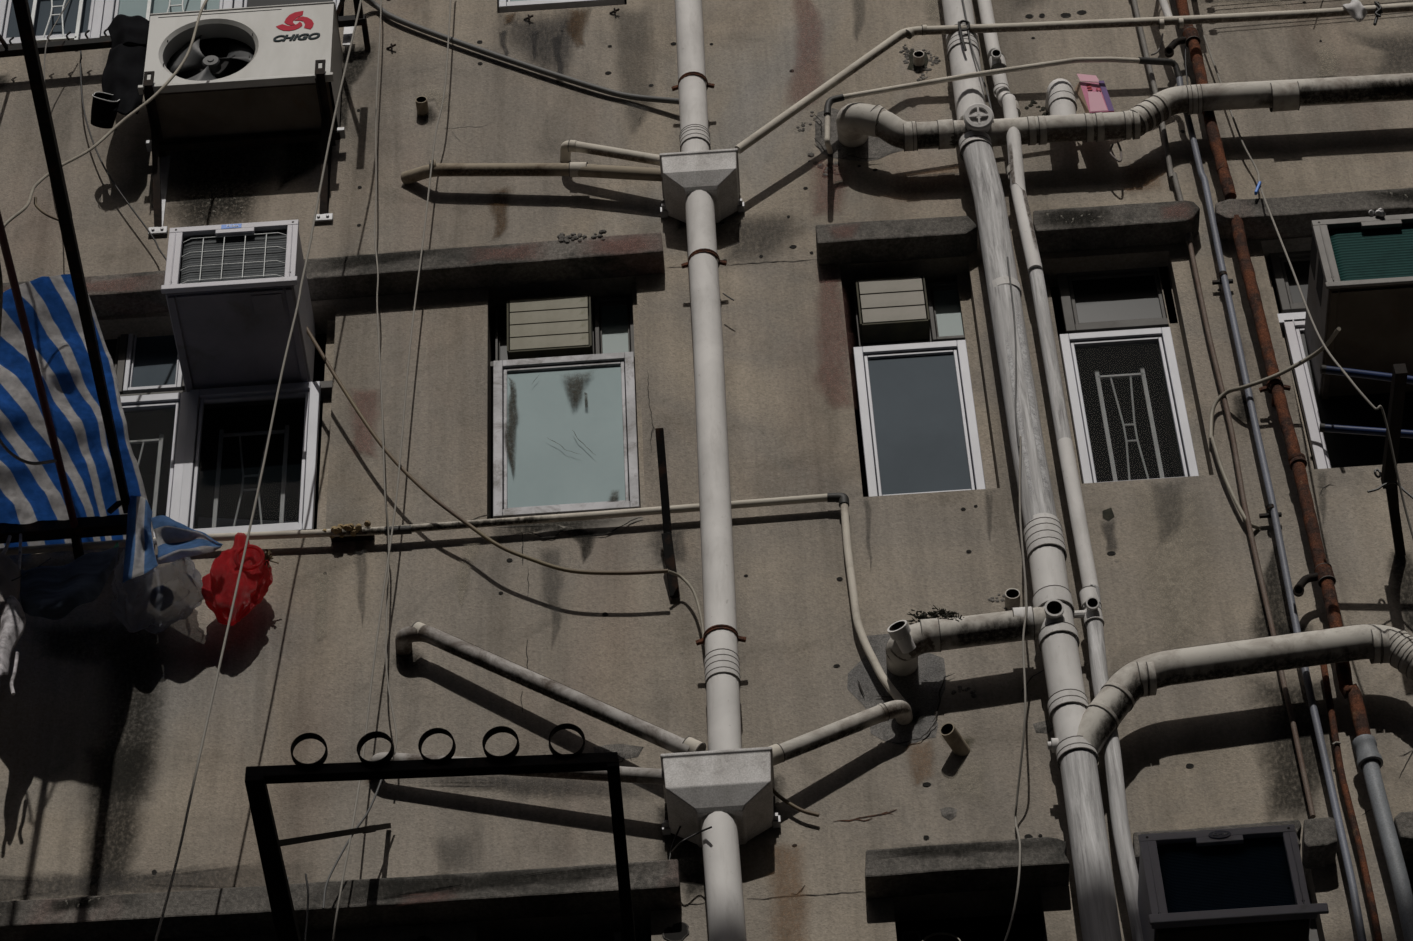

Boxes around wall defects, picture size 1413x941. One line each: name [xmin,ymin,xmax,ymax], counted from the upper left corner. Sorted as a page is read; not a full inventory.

water stain [501,17,576,83]
water stain [1392,555,1413,628]
water stain [0,629,223,909]